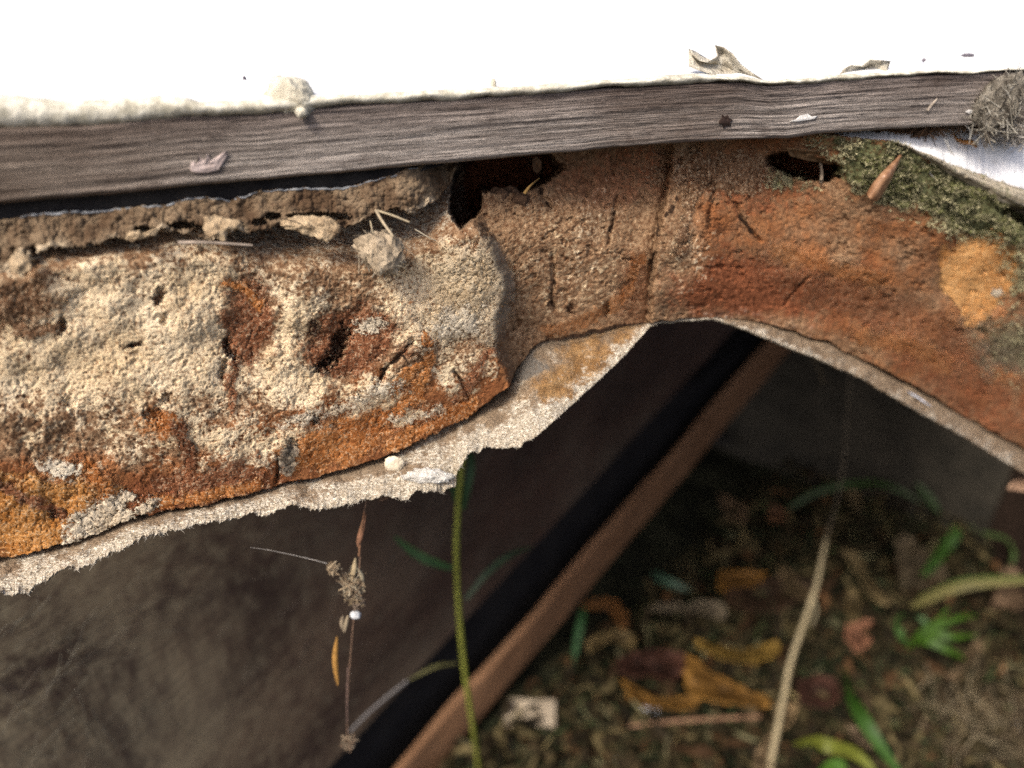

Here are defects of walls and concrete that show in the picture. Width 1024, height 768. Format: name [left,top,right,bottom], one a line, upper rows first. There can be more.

peeling [0,162,457,275]
corrosion [211,264,283,414]
spalling [292,298,419,385]
corrosion [0,330,497,558]